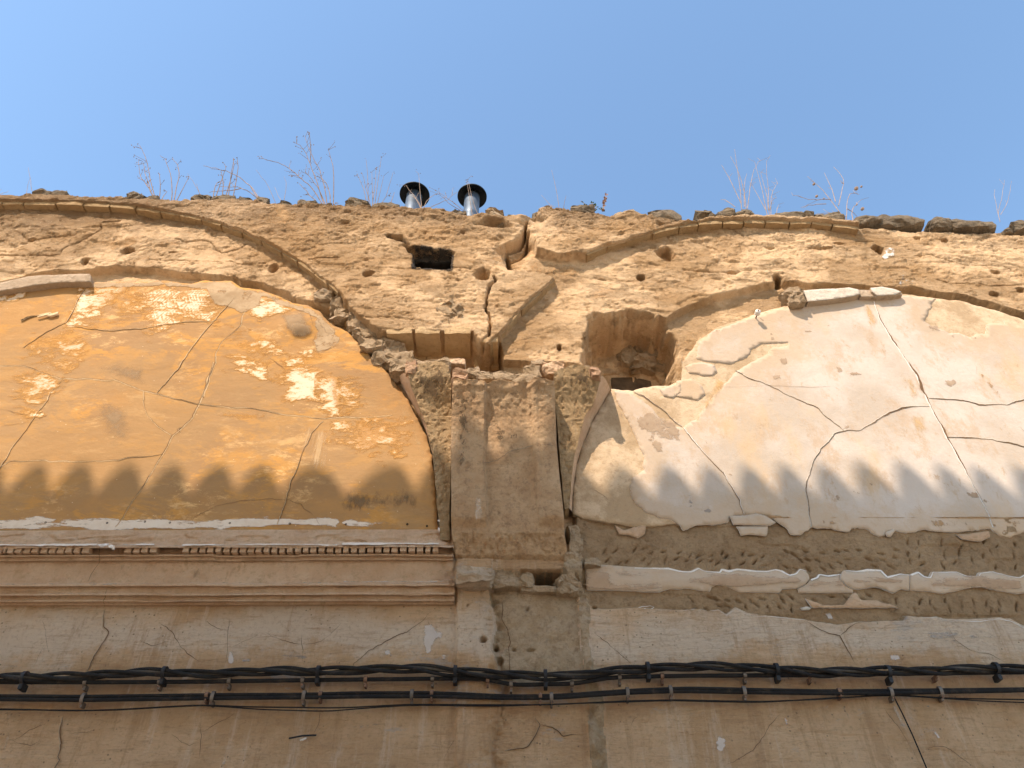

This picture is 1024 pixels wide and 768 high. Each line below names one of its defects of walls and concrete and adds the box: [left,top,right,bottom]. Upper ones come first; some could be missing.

peeling [94,281,339,351]
crack [0,287,392,527]
crack [735,302,1024,527]
crack [633,391,745,515]
peeling [615,525,646,539]
peeling [730,514,776,536]
peeling [956,531,990,542]
crack [87,548,109,671]
peeling [585,565,1024,620]